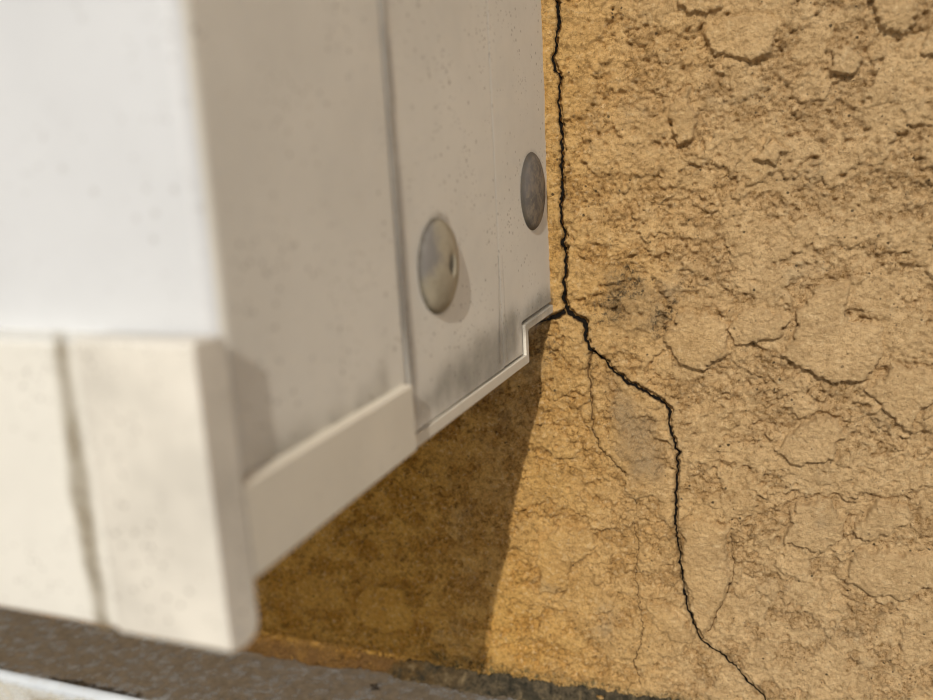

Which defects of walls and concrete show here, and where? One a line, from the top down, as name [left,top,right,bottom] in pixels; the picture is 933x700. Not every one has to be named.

crack [536,0,766,700]